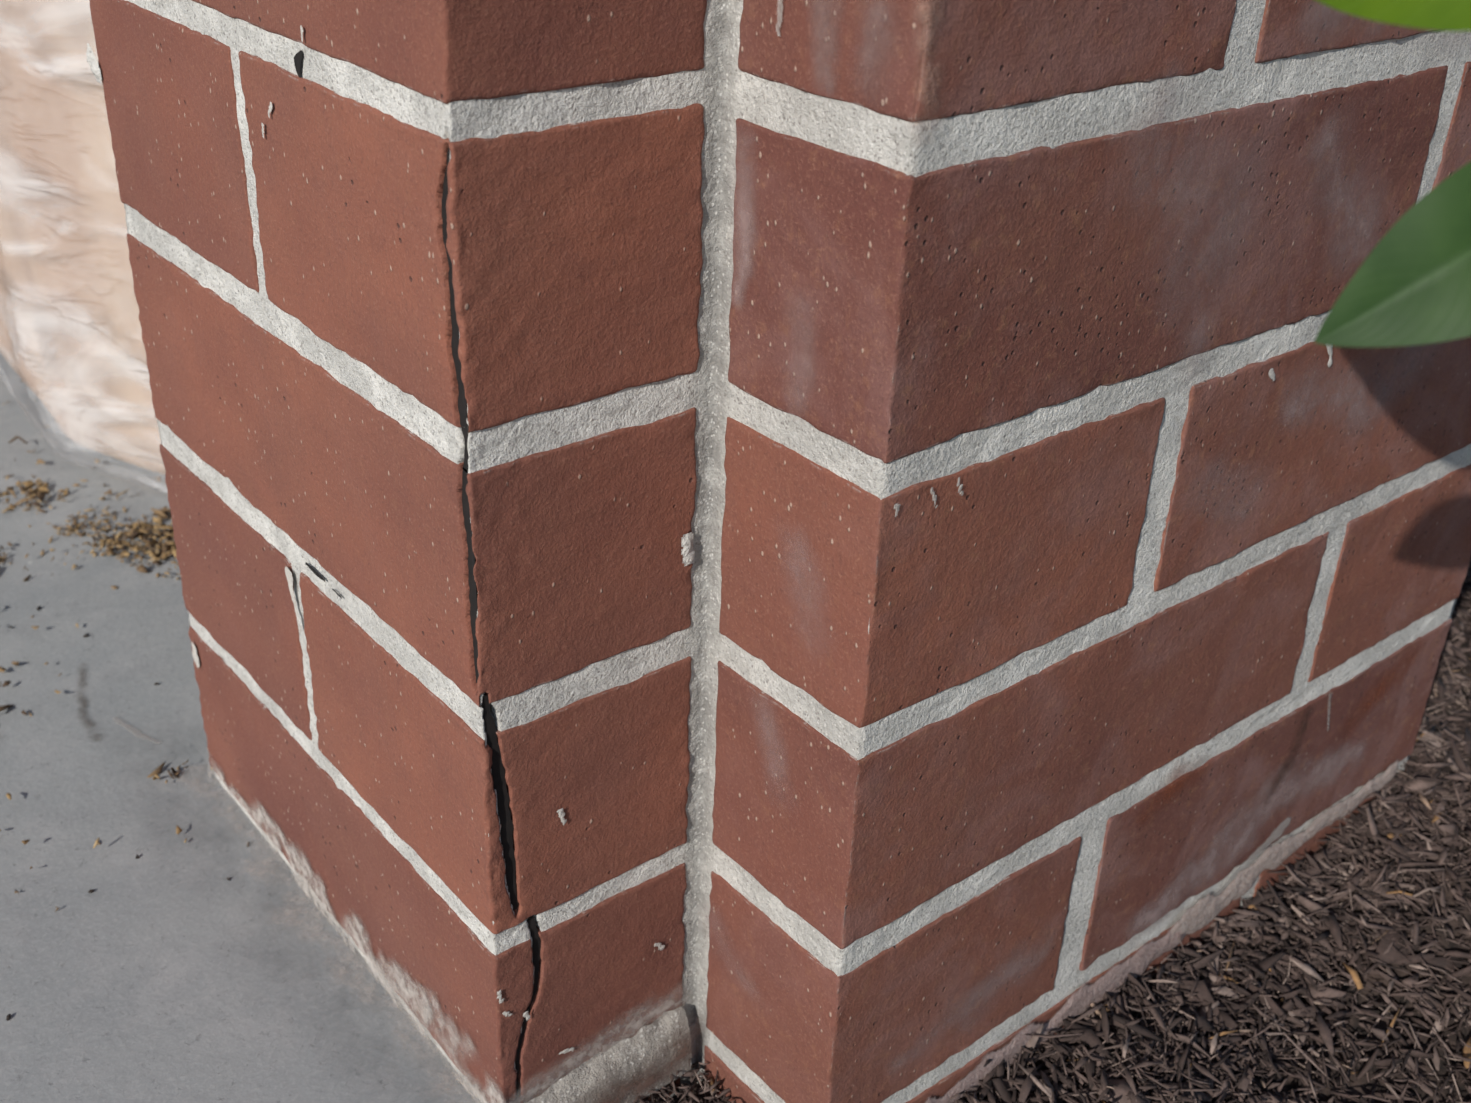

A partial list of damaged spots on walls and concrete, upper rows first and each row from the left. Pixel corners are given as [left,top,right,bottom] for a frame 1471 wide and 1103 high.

water stain [197,769,680,1103]
crack [442,147,541,1097]